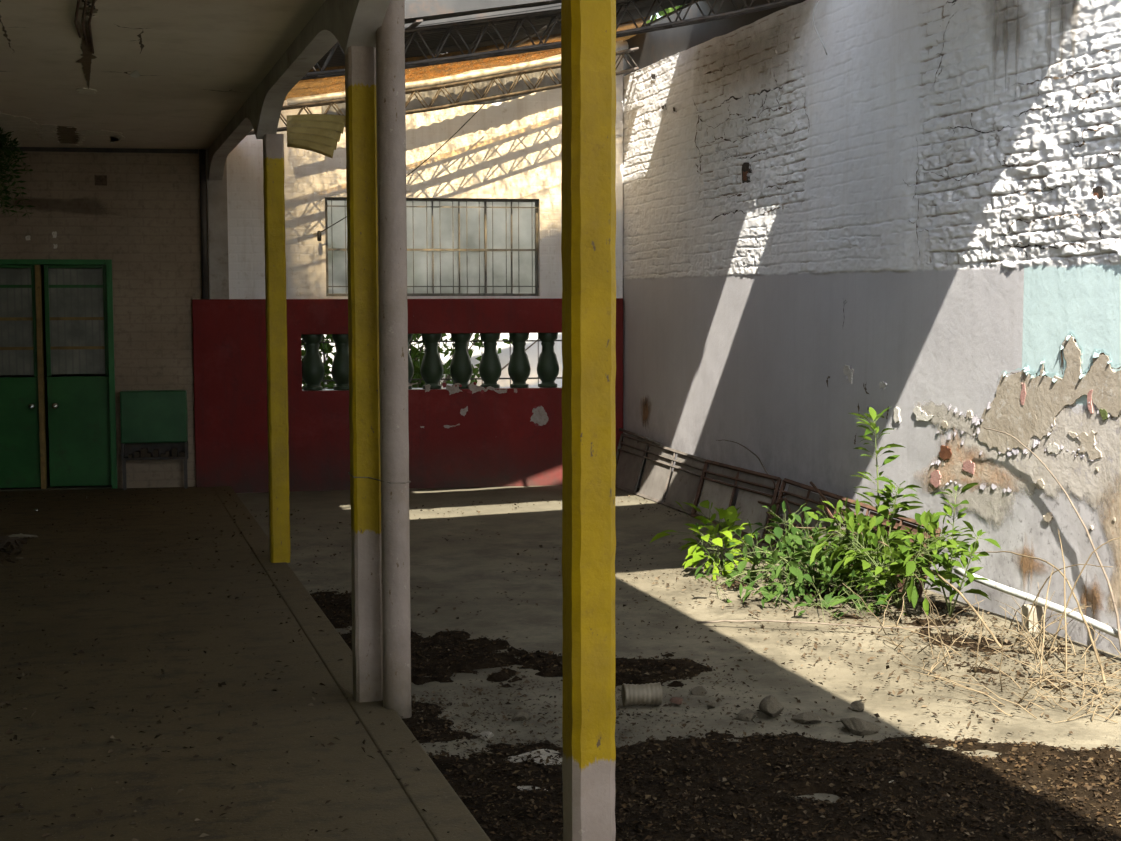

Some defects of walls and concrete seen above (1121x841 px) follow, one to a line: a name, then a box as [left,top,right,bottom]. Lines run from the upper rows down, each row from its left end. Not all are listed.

crack [0,0,25,53]
crack [933,0,957,87]
crack [693,79,809,221]
crack [903,49,1121,258]
peeling [425,382,517,428]
peeling [530,405,549,426]
peeling [893,331,1121,611]